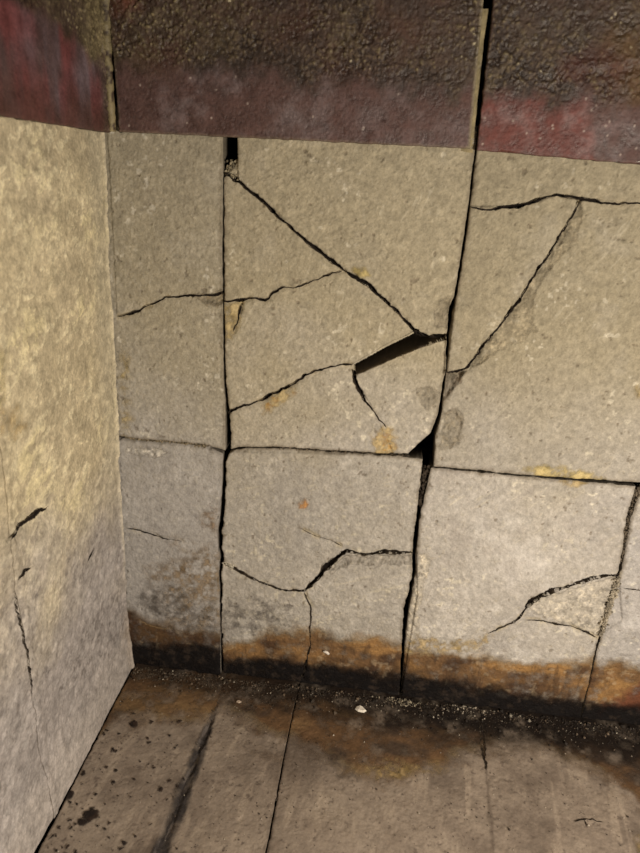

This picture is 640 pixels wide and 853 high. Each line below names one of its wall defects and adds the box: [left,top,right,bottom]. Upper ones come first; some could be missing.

crack [118,173,447,428]
crack [447,194,640,373]
crack [11,507,47,540]
crack [15,568,33,694]
crack [222,530,414,678]
crack [490,574,640,638]